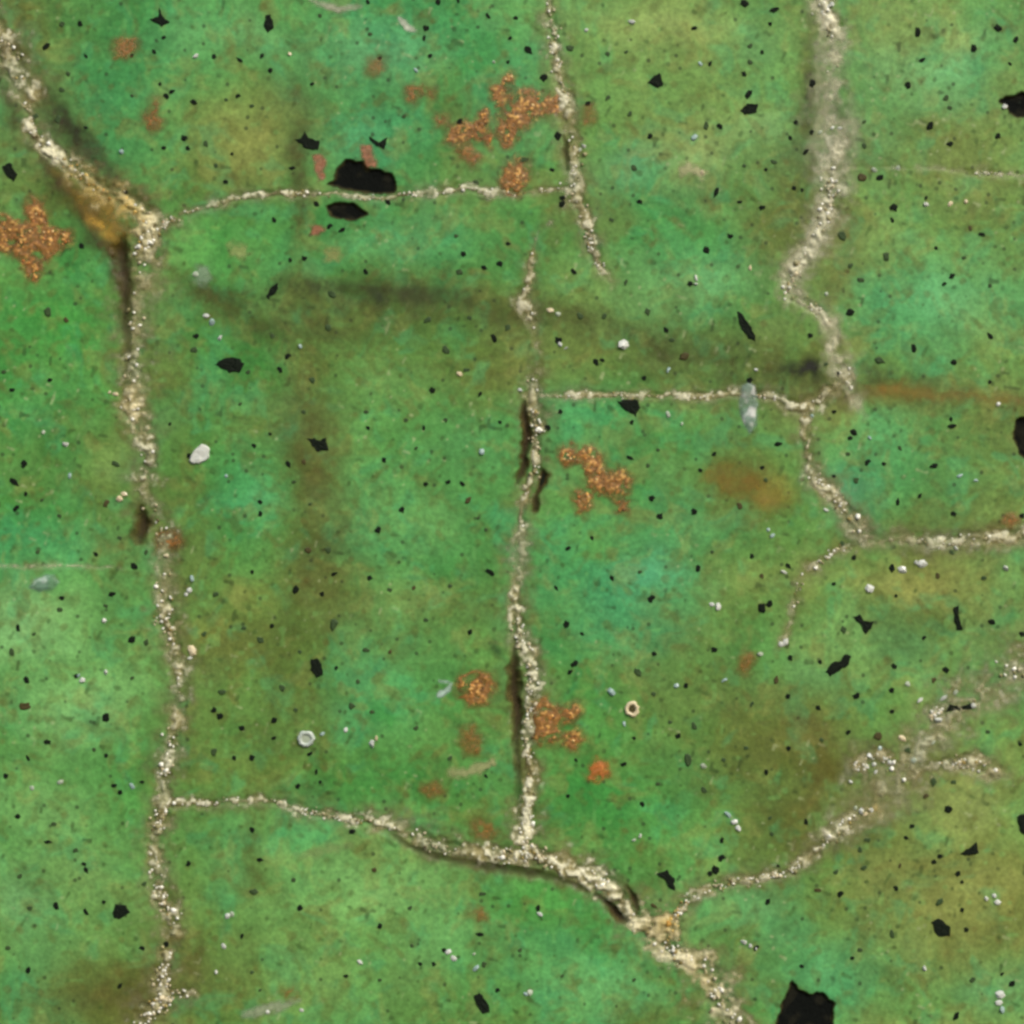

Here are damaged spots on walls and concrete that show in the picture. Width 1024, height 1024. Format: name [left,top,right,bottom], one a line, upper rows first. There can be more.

crack [812,0,844,40]
rust [436,73,561,196]
rust [0,196,72,282]
crack [0,0,607,562]
rust [559,442,632,514]
crack [148,115,1024,1024]
rust [457,670,495,706]
rust [533,696,584,751]
rust [588,761,608,780]
crack [133,945,196,1024]